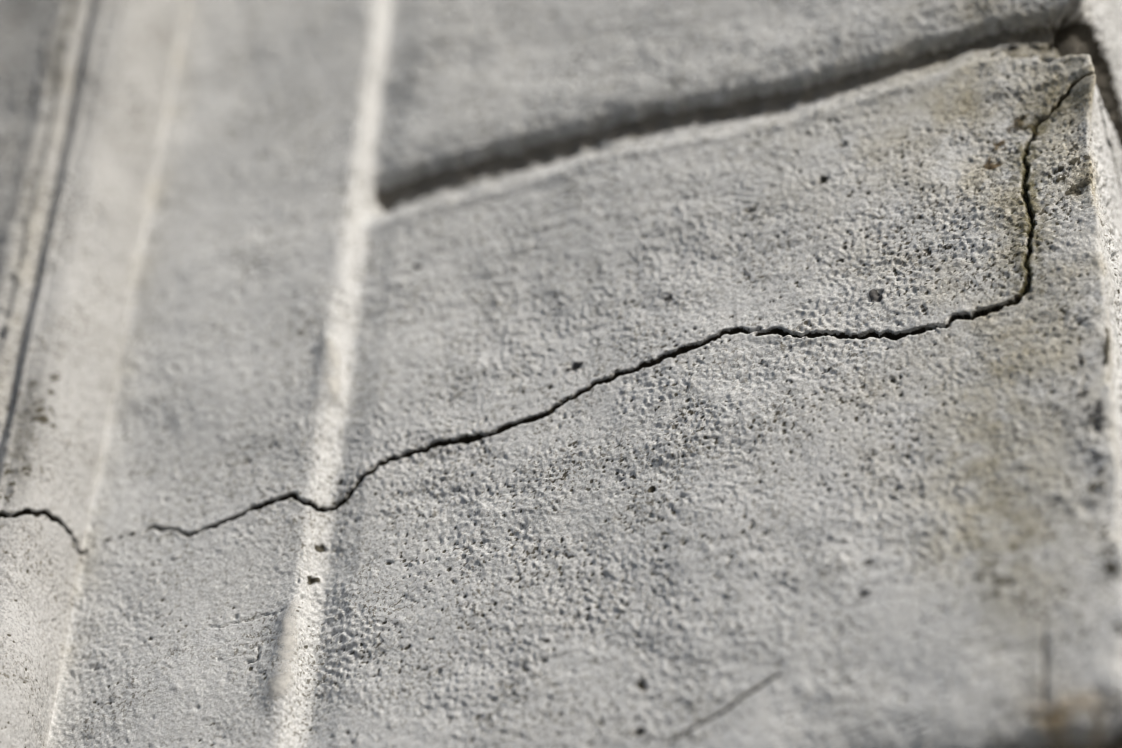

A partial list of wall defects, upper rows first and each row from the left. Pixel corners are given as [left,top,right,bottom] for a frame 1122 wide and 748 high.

crack [0,76,1122,555]